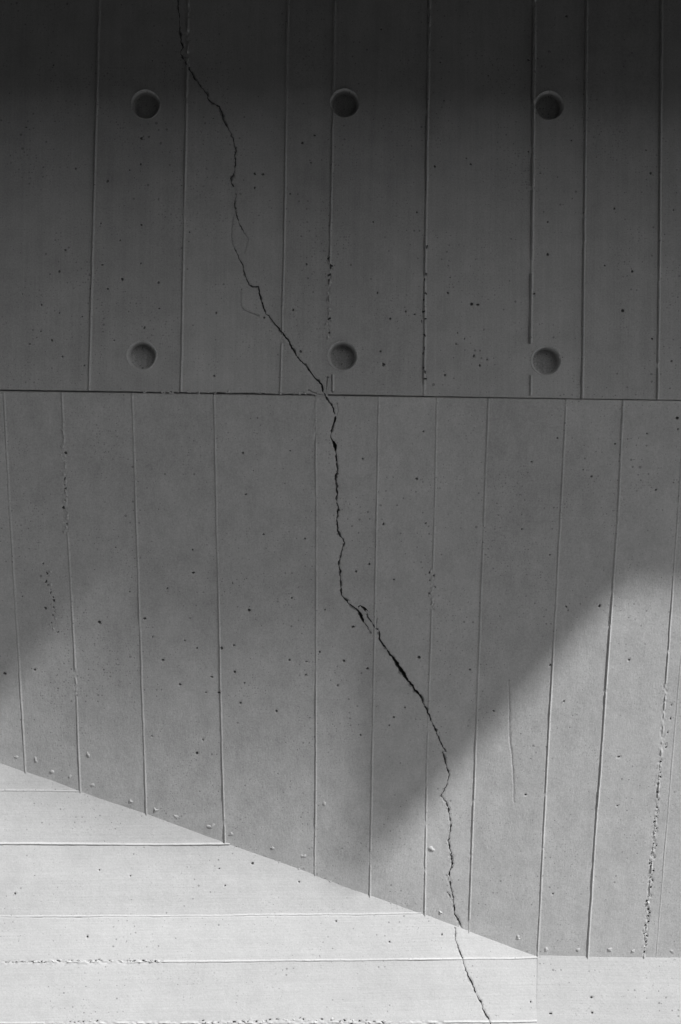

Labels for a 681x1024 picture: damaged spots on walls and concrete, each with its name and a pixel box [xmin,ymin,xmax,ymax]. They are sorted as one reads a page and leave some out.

crack [176,0,492,1024]